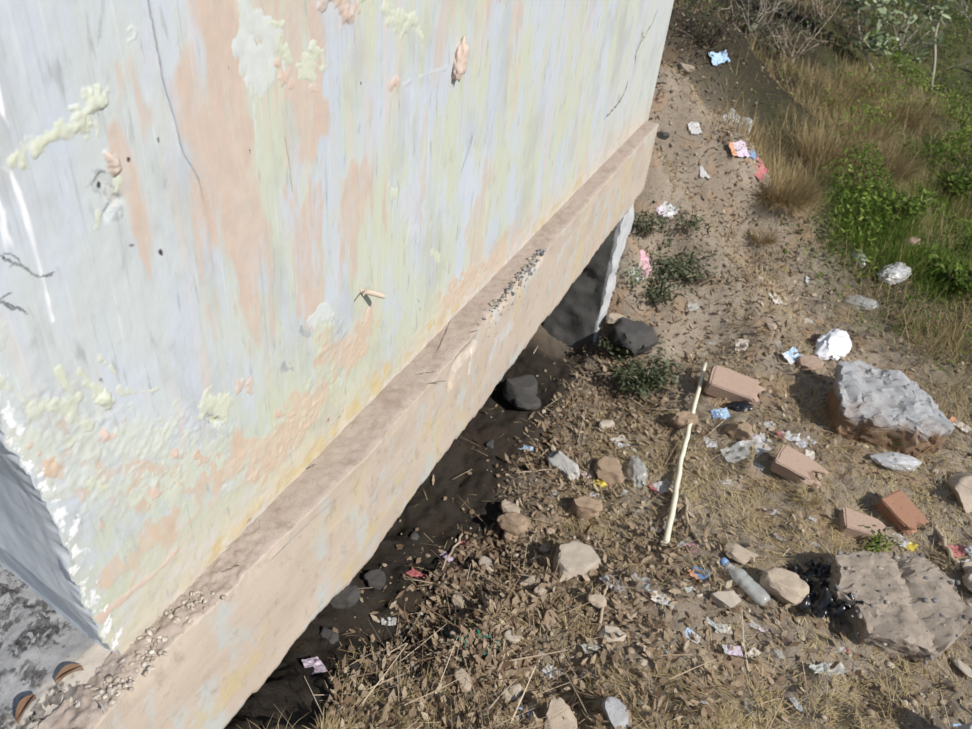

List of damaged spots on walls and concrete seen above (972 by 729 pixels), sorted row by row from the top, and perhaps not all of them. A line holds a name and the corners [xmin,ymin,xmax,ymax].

crack [148,0,203,196]
crack [604,10,658,120]
spalling [84,149,130,231]
spalling [457,248,546,379]
peeling [0,372,235,650]
spalling [83,582,227,706]